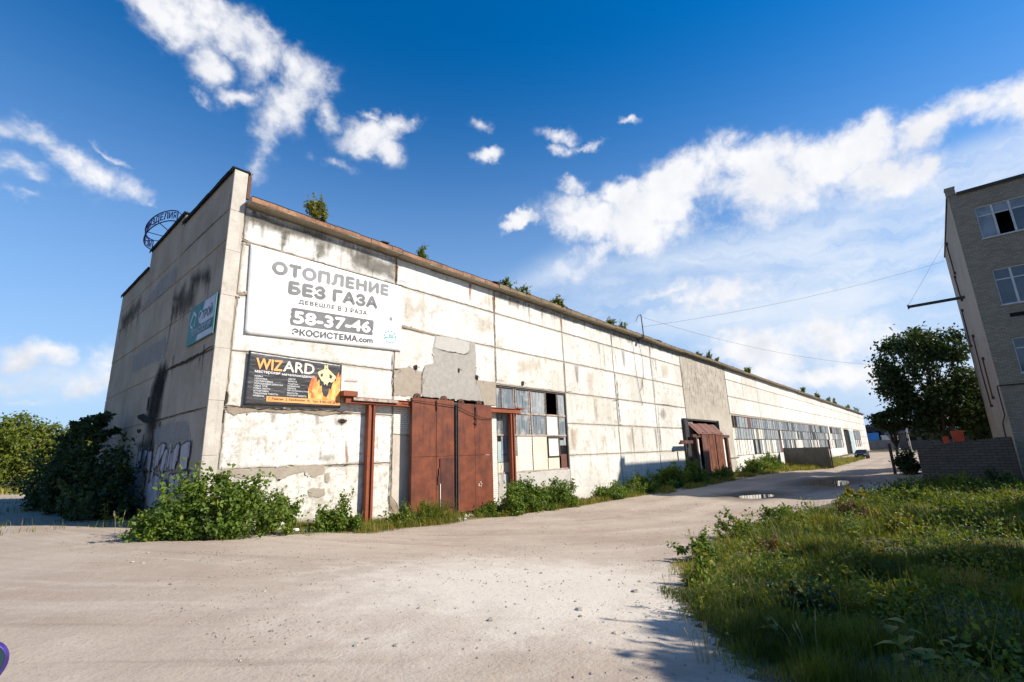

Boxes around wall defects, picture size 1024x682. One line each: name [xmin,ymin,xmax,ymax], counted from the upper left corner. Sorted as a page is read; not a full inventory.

damp [119,268,212,370]
peeling [392,324,496,406]
peeling [216,464,330,497]